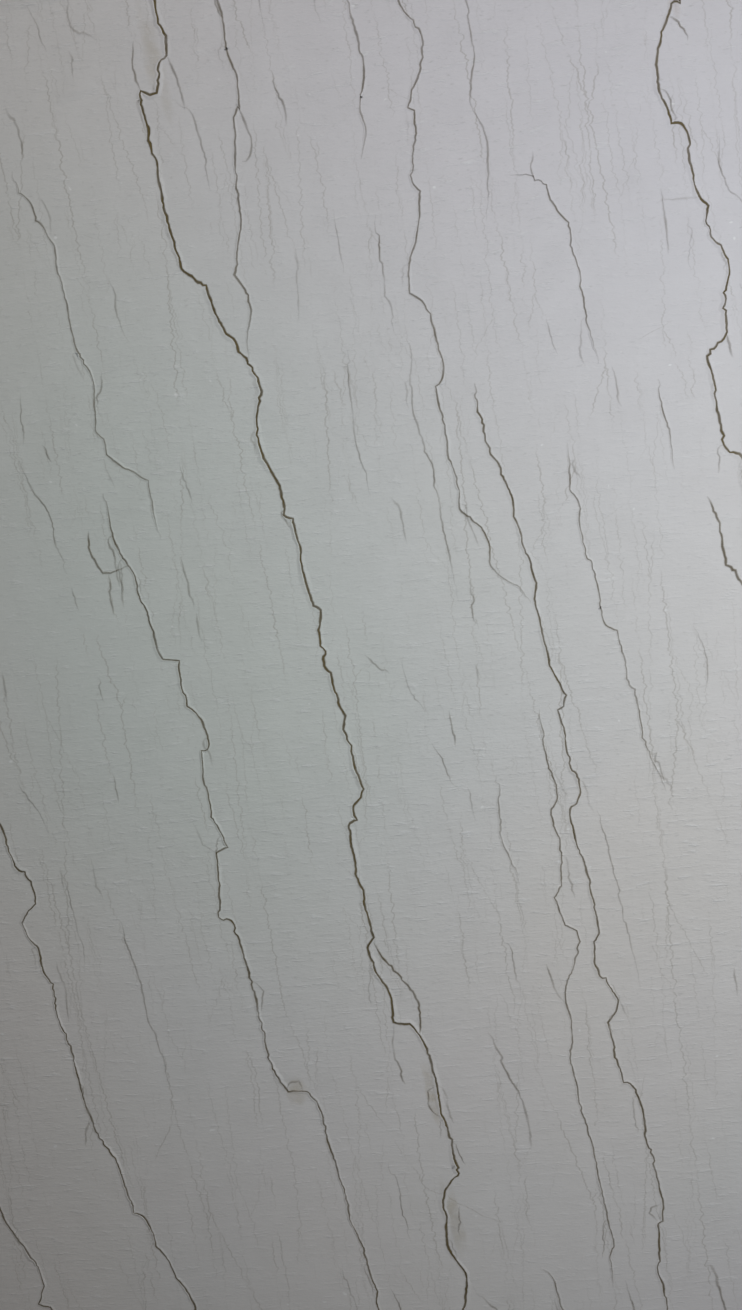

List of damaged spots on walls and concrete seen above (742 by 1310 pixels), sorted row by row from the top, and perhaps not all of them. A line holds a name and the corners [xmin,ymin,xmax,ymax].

crack [0,171,381,1310]
crack [136,0,471,1310]
crack [395,0,670,1310]
crack [652,0,742,582]